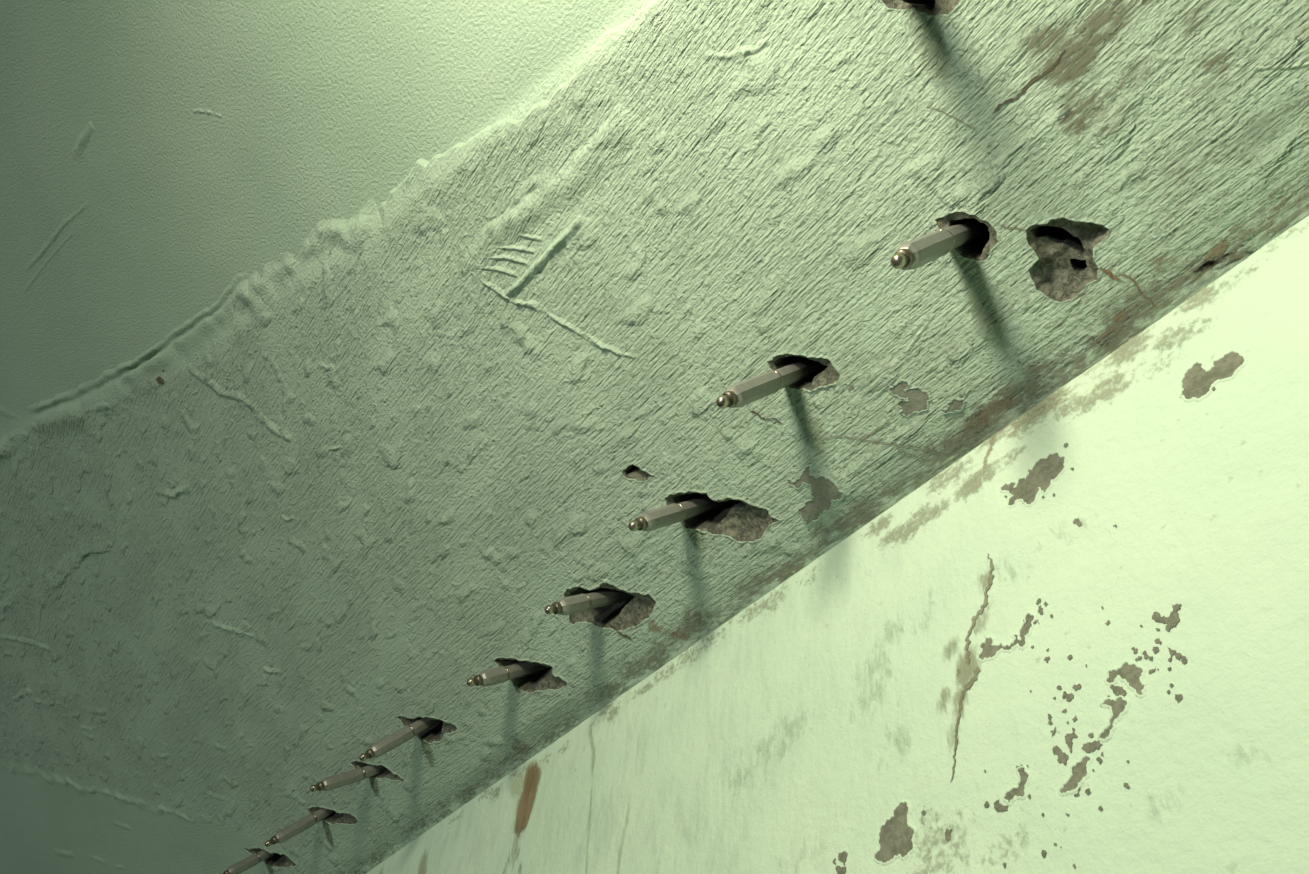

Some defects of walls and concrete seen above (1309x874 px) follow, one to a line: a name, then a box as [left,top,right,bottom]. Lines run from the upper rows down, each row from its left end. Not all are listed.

spalling [875,0,965,20]
crack [926,50,1065,131]
spalling [1023,215,1112,305]
water stain [1213,179,1309,261]
peeling [1179,350,1248,402]
spalling [663,489,781,544]
water stain [586,262,1226,721]
peeling [999,443,1074,510]
crack [950,553,994,783]
peeling [977,598,1053,663]
peeling [1048,604,1187,811]
peeling [873,800,926,866]